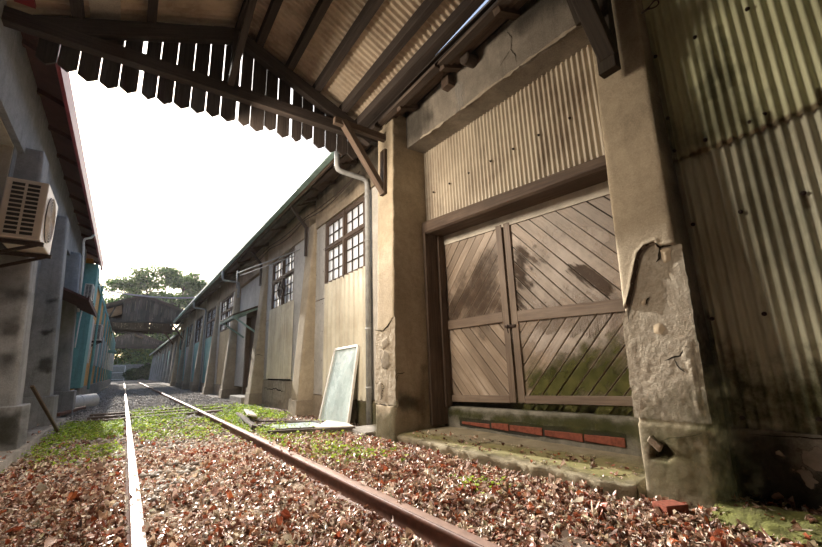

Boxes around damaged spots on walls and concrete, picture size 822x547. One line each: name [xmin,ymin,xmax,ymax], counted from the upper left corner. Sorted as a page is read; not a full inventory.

corrosion [680,89,822,160]
damp [447,230,617,320]
flaking render [622,242,712,424]
peeling [792,446,822,489]